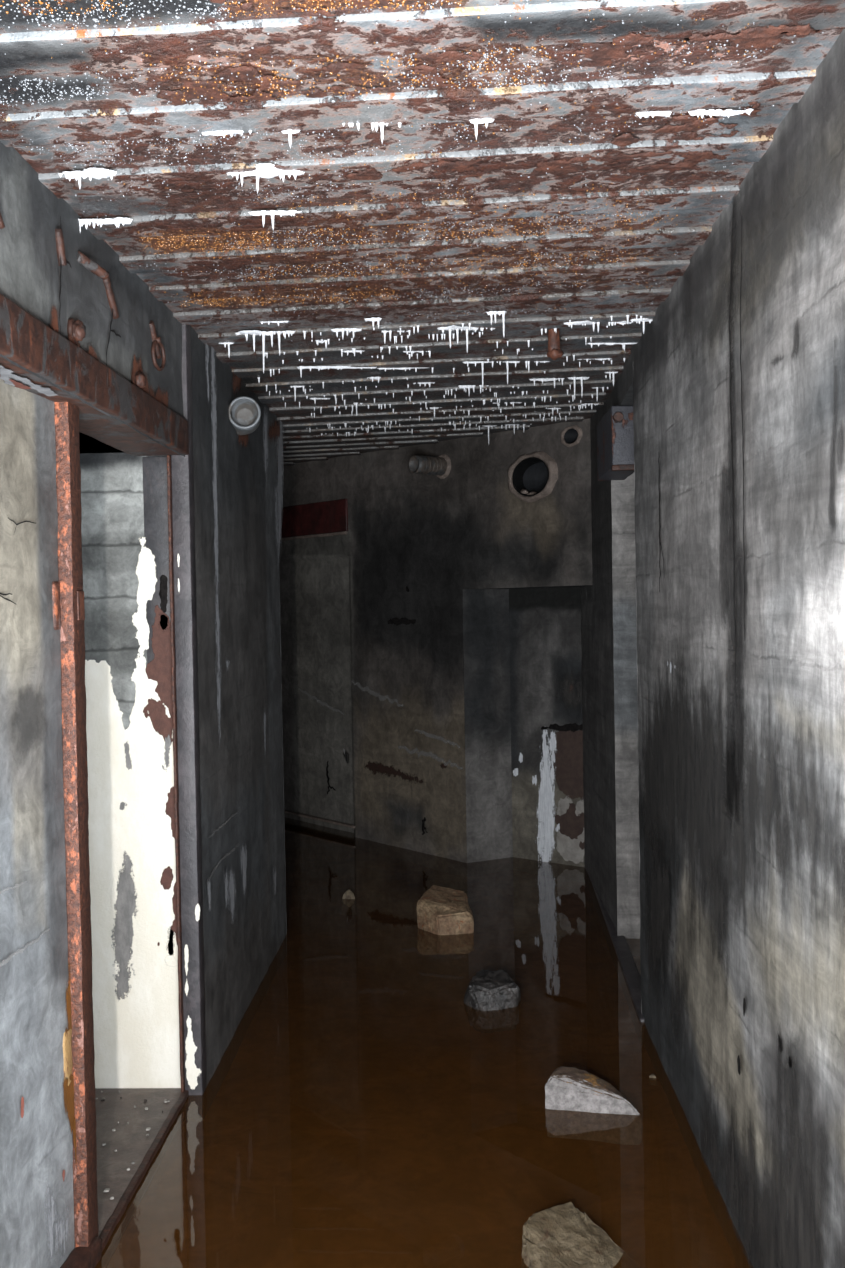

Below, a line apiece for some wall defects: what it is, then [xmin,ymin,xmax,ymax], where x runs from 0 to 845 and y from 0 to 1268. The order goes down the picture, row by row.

rust [240,0,393,18]
rust [156,51,482,106]
rust [573,23,820,66]
rust [344,101,764,180]
rust [55,229,67,266]
water stain [638,196,845,1037]
peeling [85,537,202,1089]
peeling [555,795,585,864]
water stain [700,1045,828,1268]